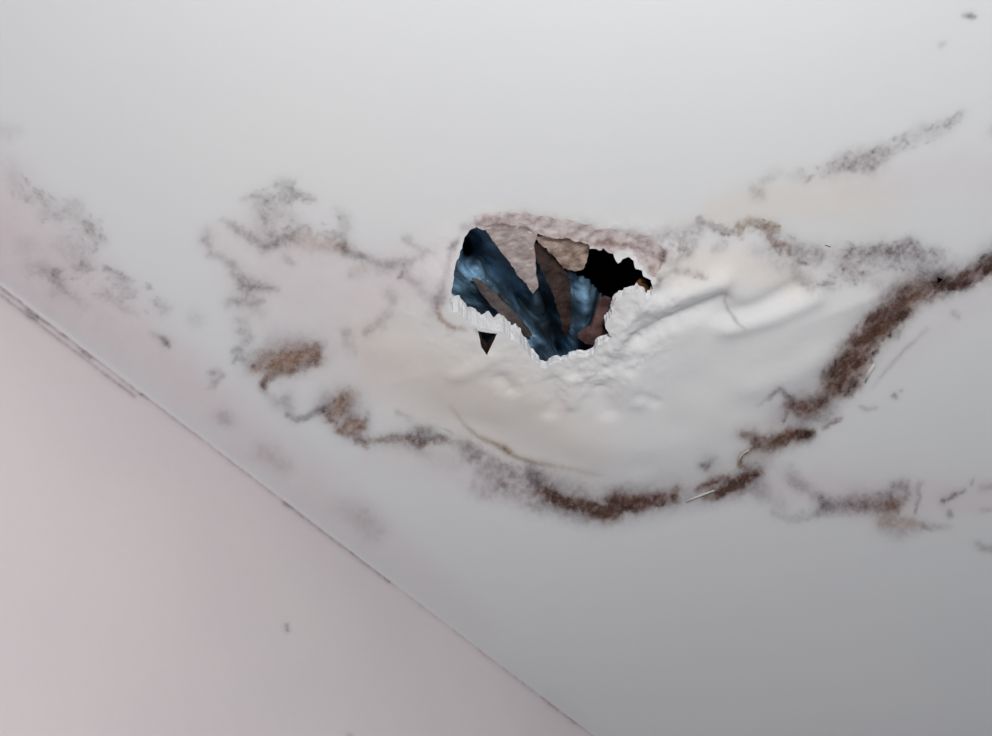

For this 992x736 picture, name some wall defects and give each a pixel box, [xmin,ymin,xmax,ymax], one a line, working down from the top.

leakage [788,254,992,418]
leakage [751,429,815,450]
leakage [697,459,759,500]
leakage [536,482,678,520]